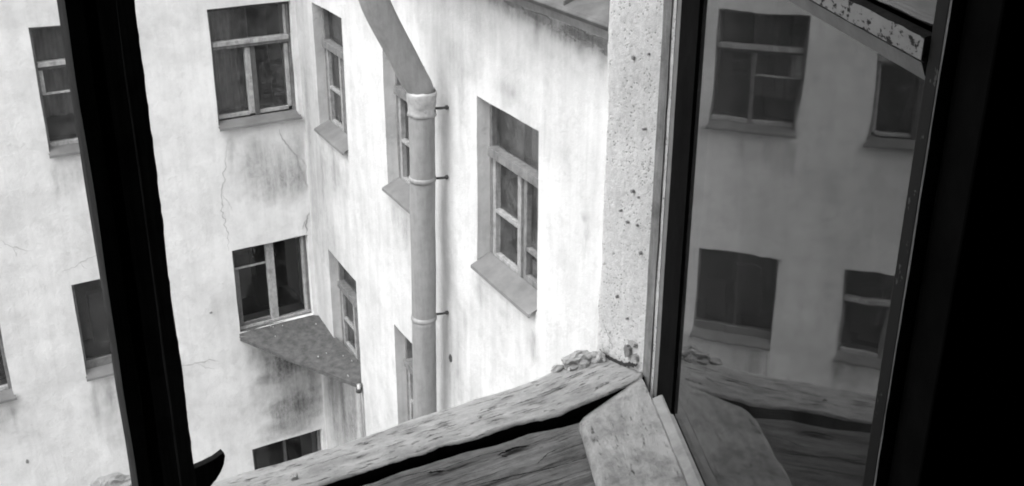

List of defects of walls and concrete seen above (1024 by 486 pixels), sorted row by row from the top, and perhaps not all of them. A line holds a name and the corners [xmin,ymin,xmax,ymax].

crack [279,130,308,187]